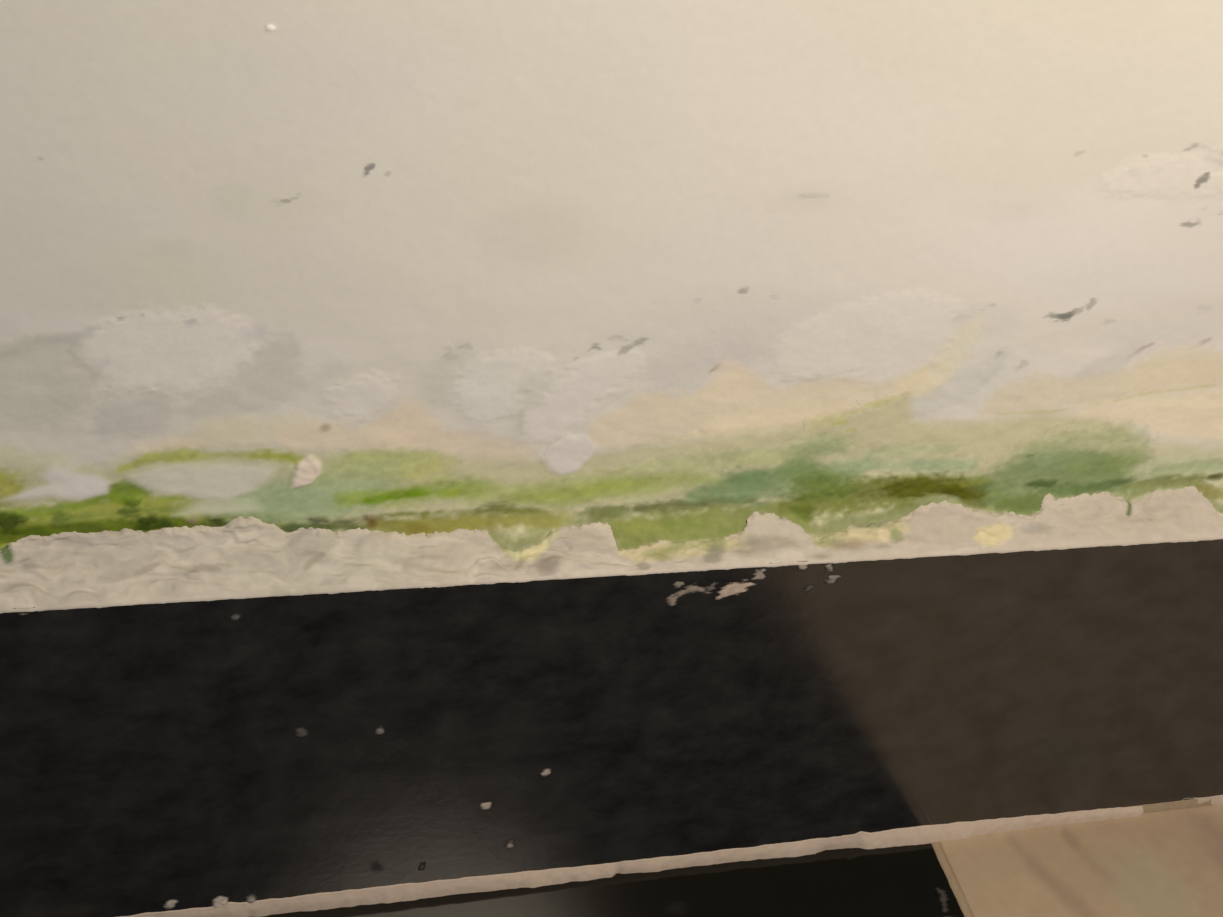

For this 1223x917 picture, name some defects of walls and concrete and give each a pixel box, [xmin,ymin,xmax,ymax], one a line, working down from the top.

water stain [0,320,359,477]
peeling [540,433,601,477]
water stain [826,439,985,475]
water stain [303,429,780,552]
water stain [990,454,1223,516]
water stain [3,500,146,534]
water stain [811,493,974,539]
water stain [0,534,23,548]
spalling [475,550,573,577]
spalling [698,532,892,564]